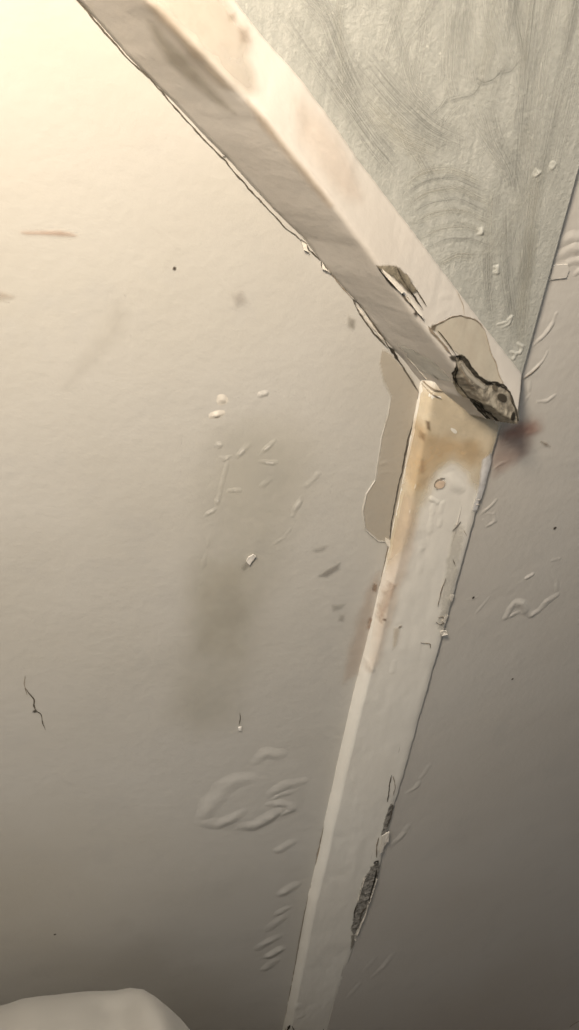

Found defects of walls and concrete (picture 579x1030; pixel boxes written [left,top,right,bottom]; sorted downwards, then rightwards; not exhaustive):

peeling [376,265,519,424]
crack [24,678,45,728]
flaking render [351,775,395,948]